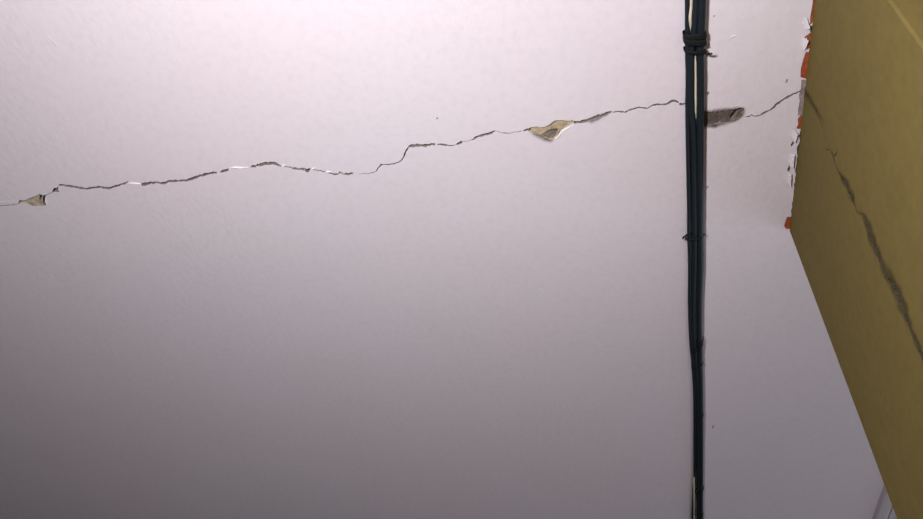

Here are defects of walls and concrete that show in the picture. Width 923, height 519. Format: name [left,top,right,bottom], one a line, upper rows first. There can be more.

crack [574,100,685,124]
spalling [704,107,744,125]
spalling [528,120,573,140]
crack [46,128,529,195]
spalling [16,194,48,206]
crack [746,87,923,361]